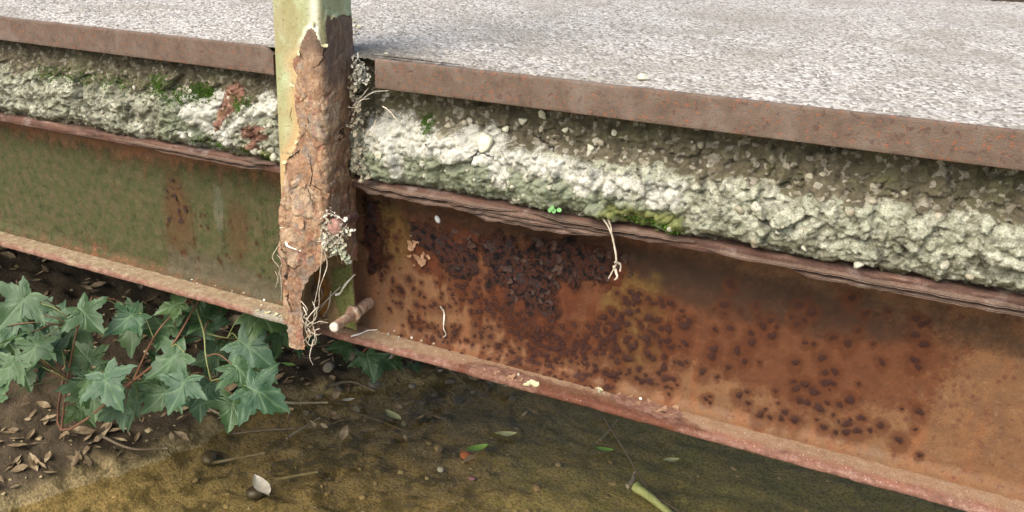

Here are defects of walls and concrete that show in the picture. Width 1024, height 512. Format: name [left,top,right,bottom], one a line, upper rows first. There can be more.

rust [213,83,245,132]
spalling [0,14,1024,350]
rust [346,183,1024,345]